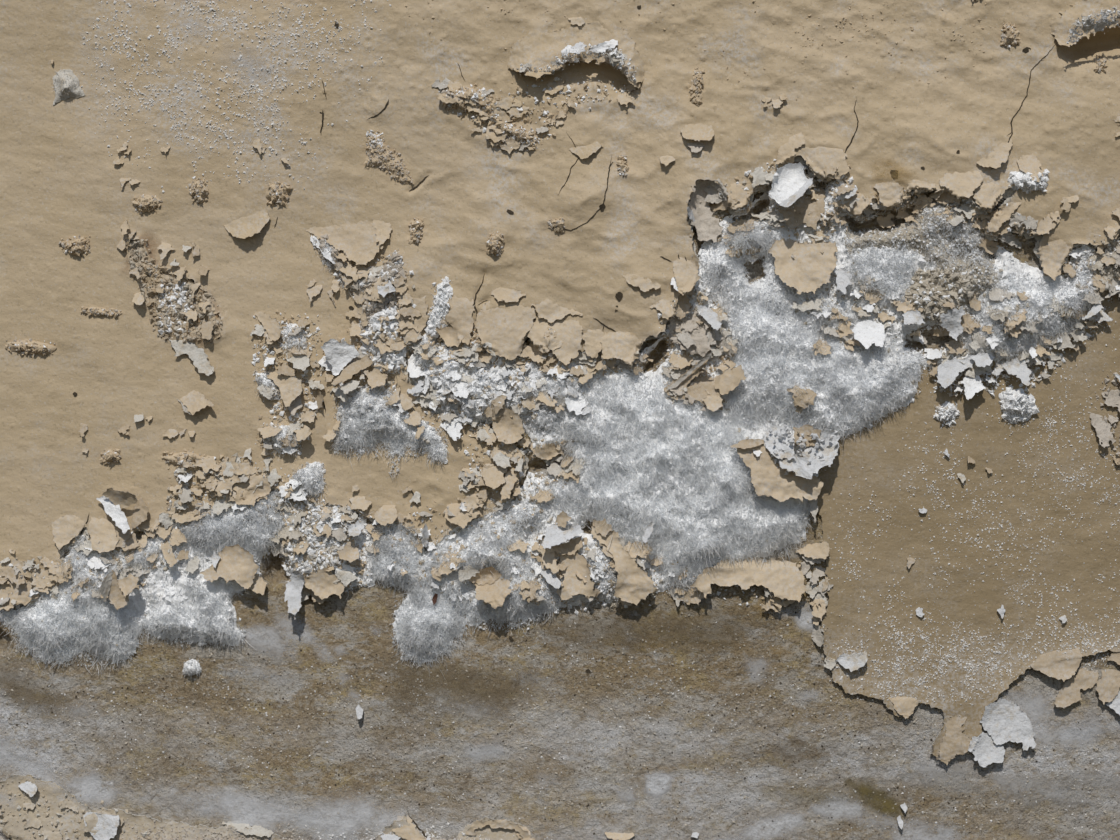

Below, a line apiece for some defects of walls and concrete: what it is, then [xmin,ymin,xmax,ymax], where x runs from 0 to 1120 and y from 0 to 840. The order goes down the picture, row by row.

damp [1065,6,1120,44]
spalling [431,72,641,154]
peeling [224,208,270,239]
peeling [0,220,868,672]
damp [0,176,1120,716]
peeling [1030,647,1120,715]
peeling [936,698,1037,767]
spalling [0,781,150,840]
damp [70,775,114,801]
damp [646,774,670,795]
damp [742,815,802,840]
damp [814,784,898,817]